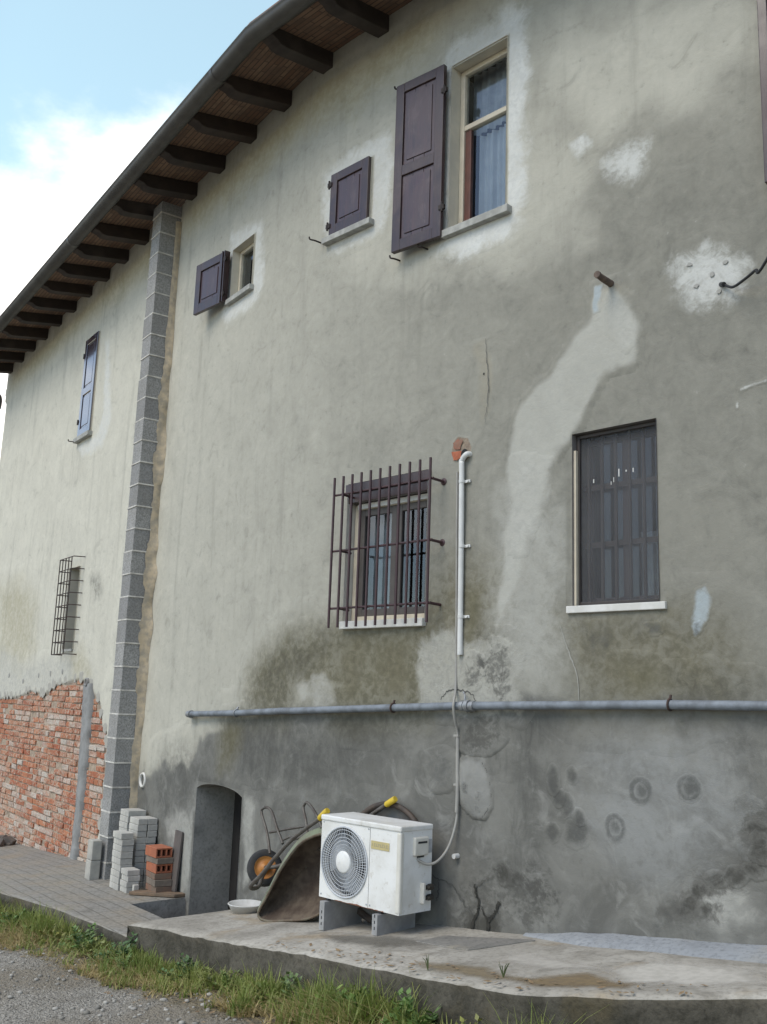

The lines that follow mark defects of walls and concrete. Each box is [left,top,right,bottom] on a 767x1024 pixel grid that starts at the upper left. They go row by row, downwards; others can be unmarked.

spalling [0,642,108,862]
damp [143,450,767,934]
peeling [689,583,714,639]
crack [431,874,501,932]